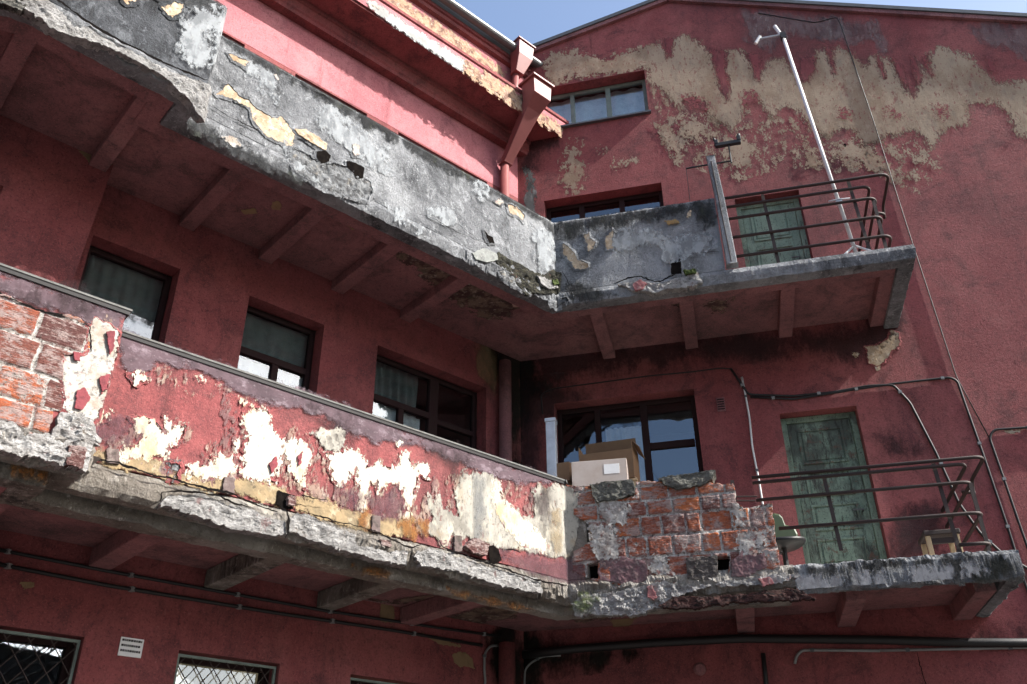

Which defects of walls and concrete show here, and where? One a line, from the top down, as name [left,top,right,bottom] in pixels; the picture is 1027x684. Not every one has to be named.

spalling [0,0,378,205]
spalling [366,0,523,111]
peeling [537,34,1027,196]
water stain [394,251,451,286]
spalling [618,259,703,298]
water stain [0,271,906,486]
peeling [852,329,902,371]
crack [98,459,567,586]
water stain [343,486,405,520]
flaking render [0,294,816,627]
water stain [787,504,1021,590]